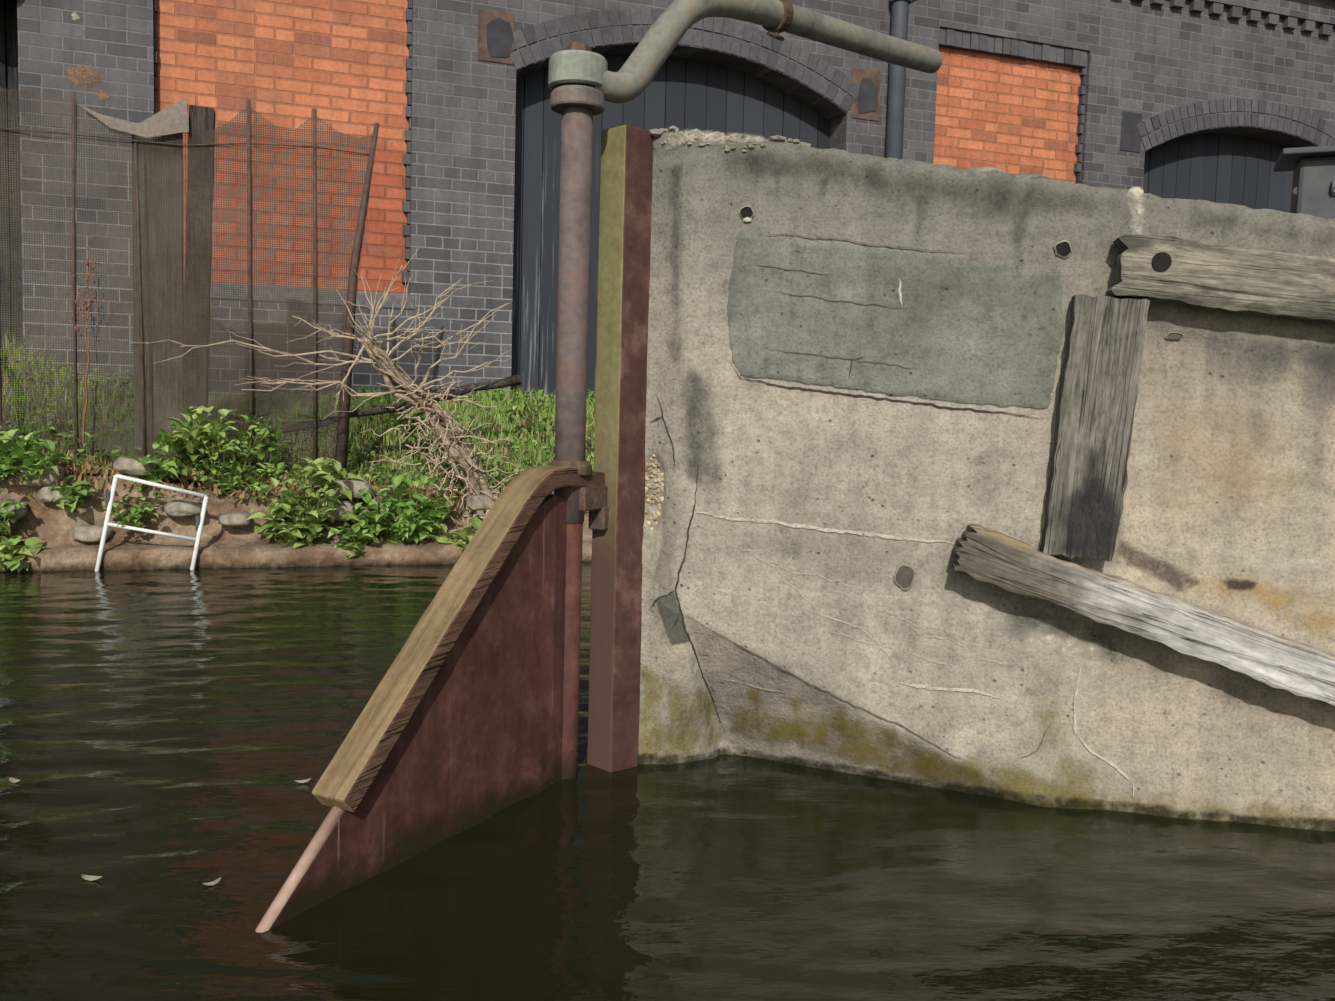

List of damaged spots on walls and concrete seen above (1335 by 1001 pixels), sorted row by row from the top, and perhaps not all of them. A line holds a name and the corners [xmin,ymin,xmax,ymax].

crack [649,395,973,765]
rust [1121,543,1193,588]
rust [1226,580,1255,589]
damp [638,618,1335,832]